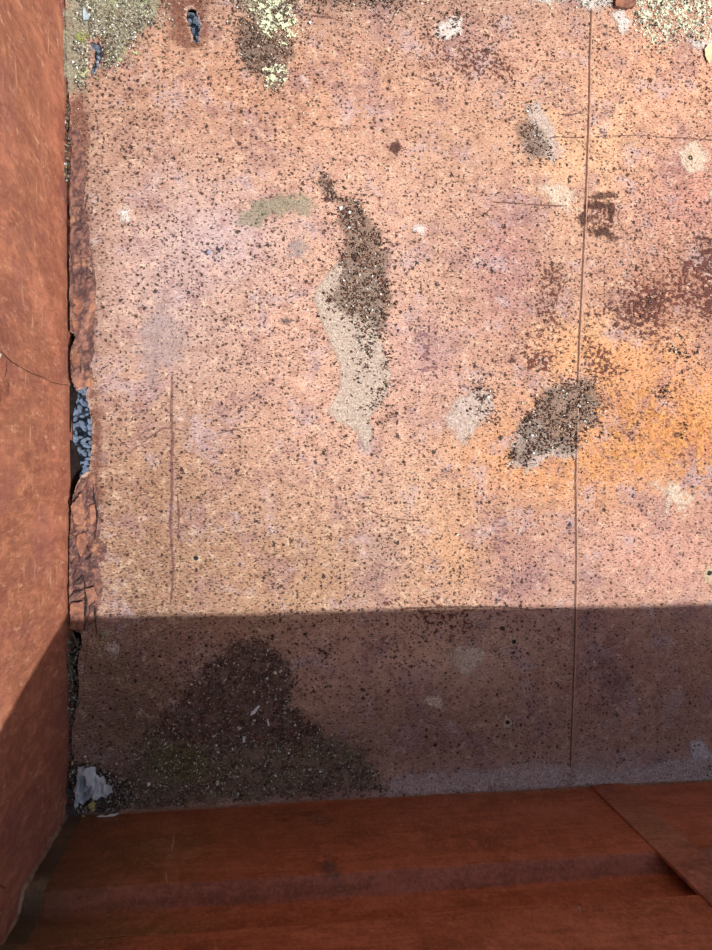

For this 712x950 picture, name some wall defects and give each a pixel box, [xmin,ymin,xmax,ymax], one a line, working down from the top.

peeling [71,296,83,330]
corrosion [508,209,712,504]
peeling [71,494,96,556]
peeling [70,587,98,631]